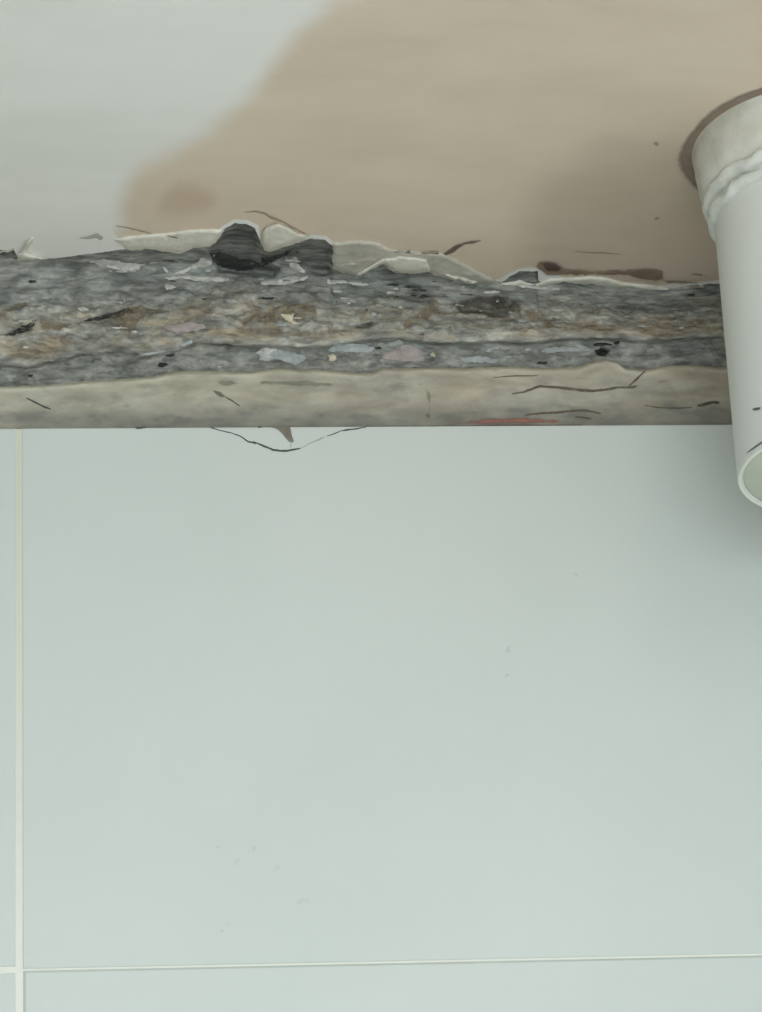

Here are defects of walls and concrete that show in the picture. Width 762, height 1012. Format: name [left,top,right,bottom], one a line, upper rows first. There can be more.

damp [101,0,762,286]
crack [210,425,368,452]
spalling [0,223,732,442]
crack [494,371,719,419]